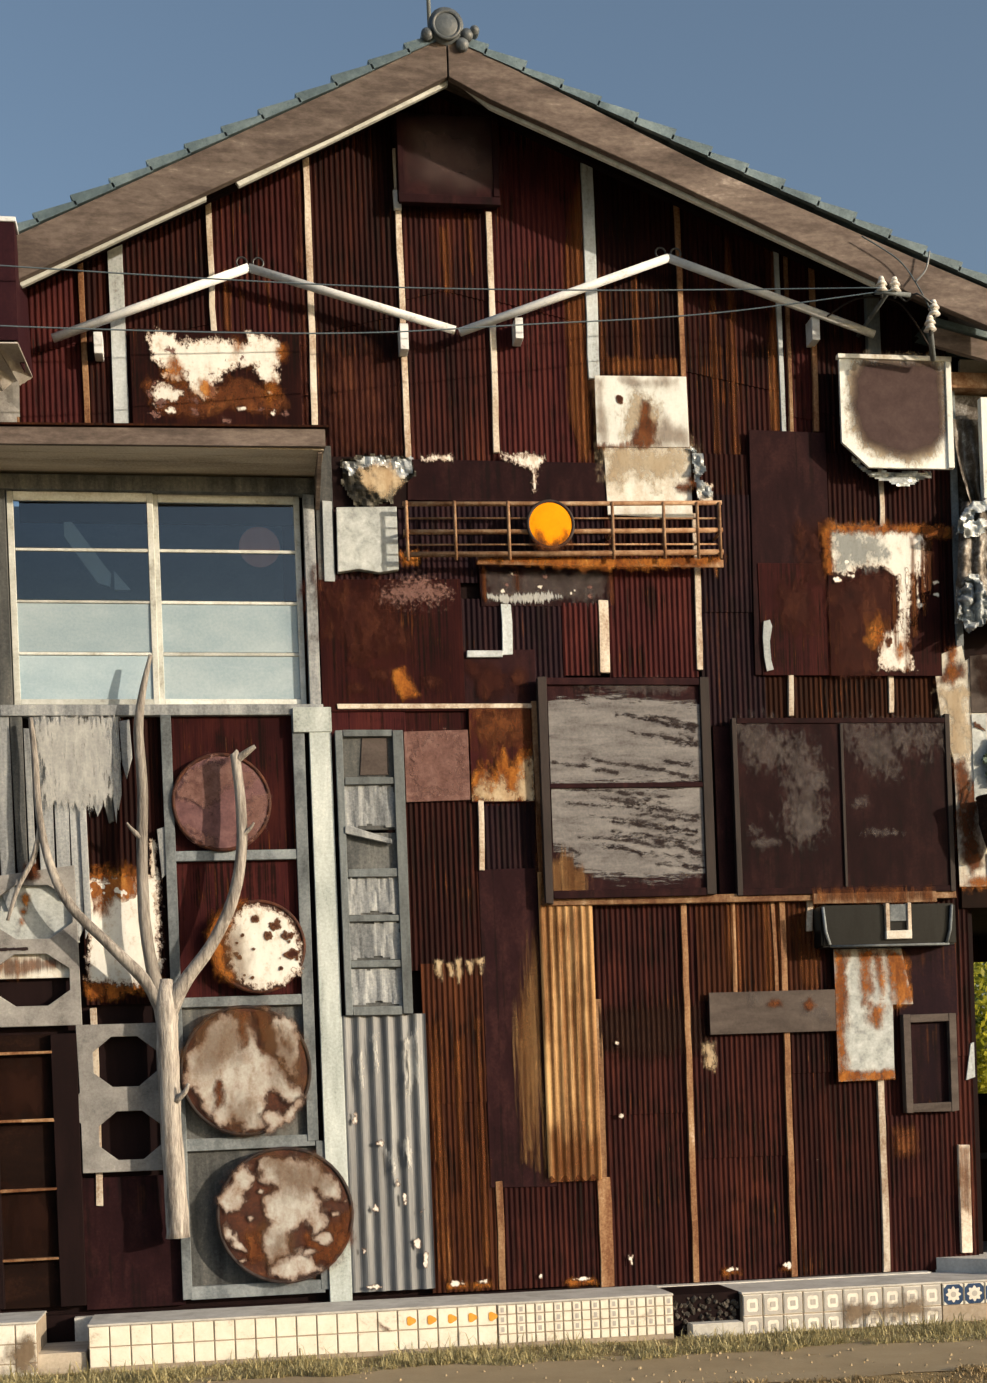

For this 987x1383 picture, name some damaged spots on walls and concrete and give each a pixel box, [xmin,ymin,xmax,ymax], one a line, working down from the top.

rust [144,161,418,497]
rust [565,178,678,463]
rust [821,522,952,679]
rust [348,649,441,699]
peeling [548,690,705,883]
rust [89,866,137,915]
rust [206,912,300,981]
rust [469,708,715,1182]
rust [759,887,937,1011]
rust [833,948,913,1082]
rust [214,1080,225,1107]
rust [304,1212,354,1266]